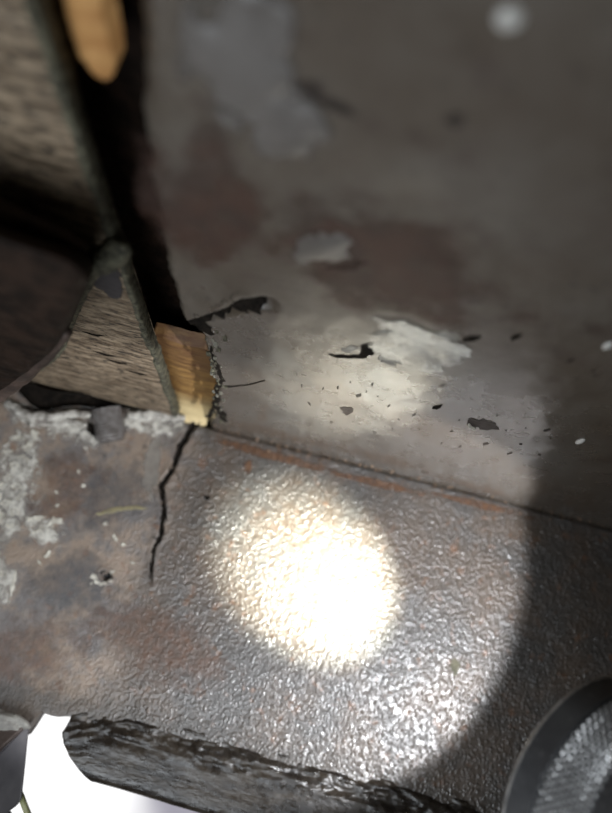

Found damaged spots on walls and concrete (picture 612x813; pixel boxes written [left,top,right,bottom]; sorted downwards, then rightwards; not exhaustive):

peeling [341,316,481,373]
crack [149,291,267,578]
corrosion [219,440,324,473]
peeling [467,418,499,431]